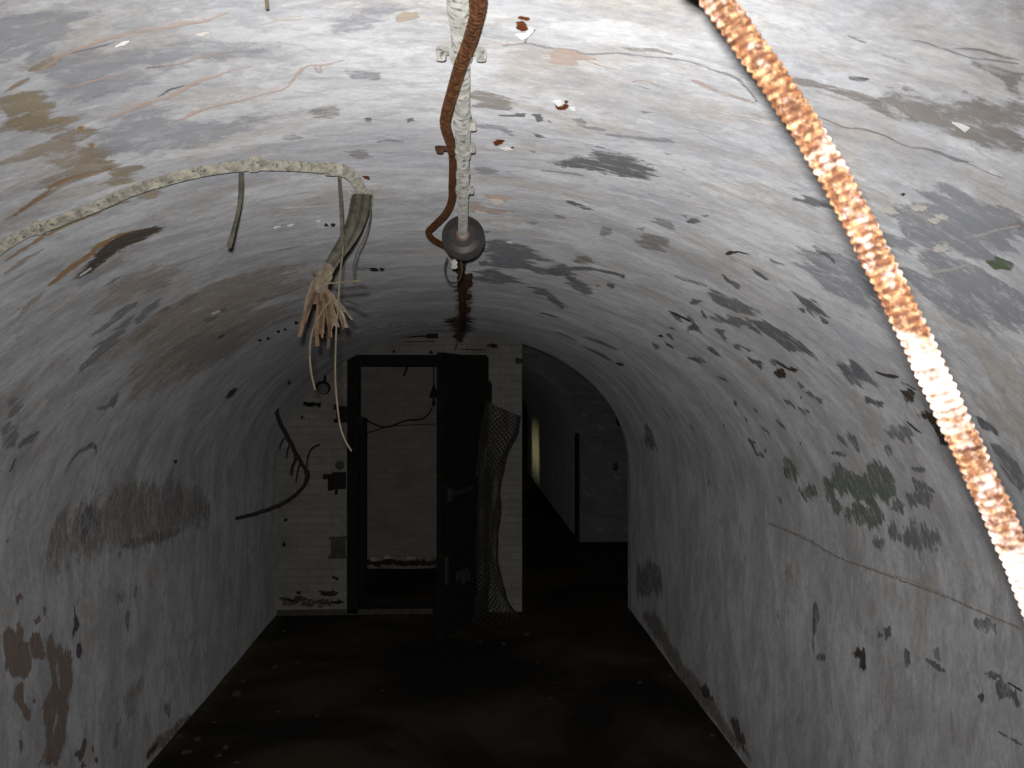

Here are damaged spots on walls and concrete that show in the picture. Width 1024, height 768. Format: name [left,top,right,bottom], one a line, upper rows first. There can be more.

damp [0,91,143,189]
peeling [514,113,551,138]
peeling [540,100,670,181]
peeling [792,195,834,209]
peeling [20,225,164,316]
peeling [791,291,830,325]
peeling [770,246,884,312]
peeling [875,183,1024,332]
peeling [783,360,949,558]
spalling [976,416,1024,491]
crack [768,523,1021,630]
peeling [3,606,73,766]